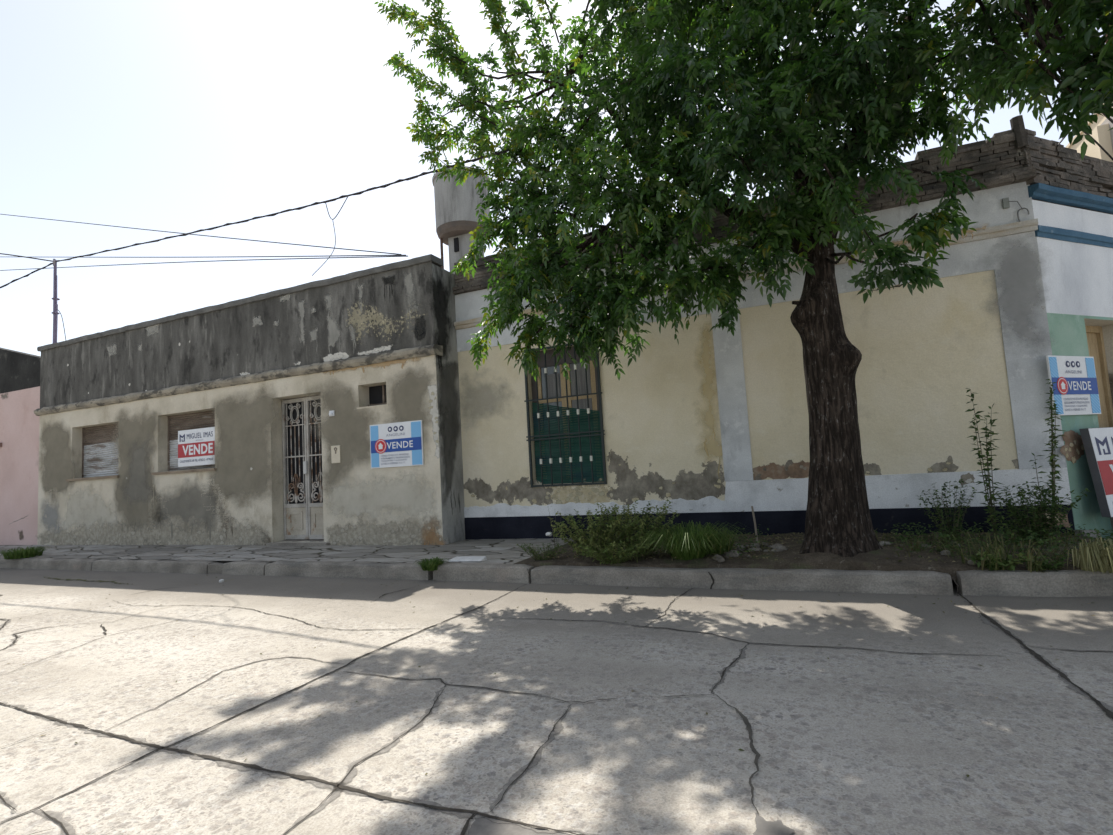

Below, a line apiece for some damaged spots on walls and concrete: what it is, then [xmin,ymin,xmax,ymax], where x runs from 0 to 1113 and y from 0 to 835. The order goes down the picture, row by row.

water stain [41,391,277,542]
water stain [299,296,356,353]
water stain [319,273,460,514]
peeling [463,449,725,506]
peeling [753,460,810,480]
crack [0,569,1113,835]